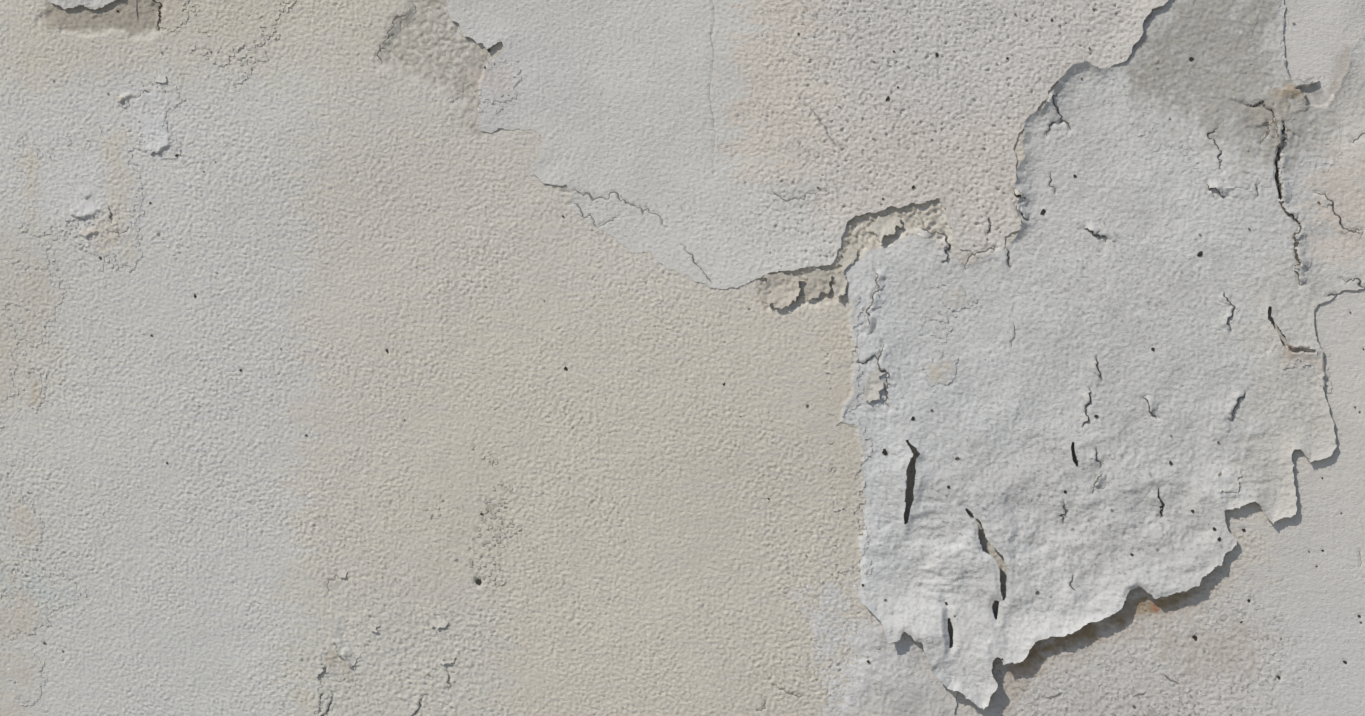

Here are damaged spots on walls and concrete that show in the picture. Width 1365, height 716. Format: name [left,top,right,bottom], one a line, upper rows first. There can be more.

spalling [35,0,159,37]
crack [1244,101,1364,297]
peeling [376,0,1365,716]
peeling [312,606,379,716]